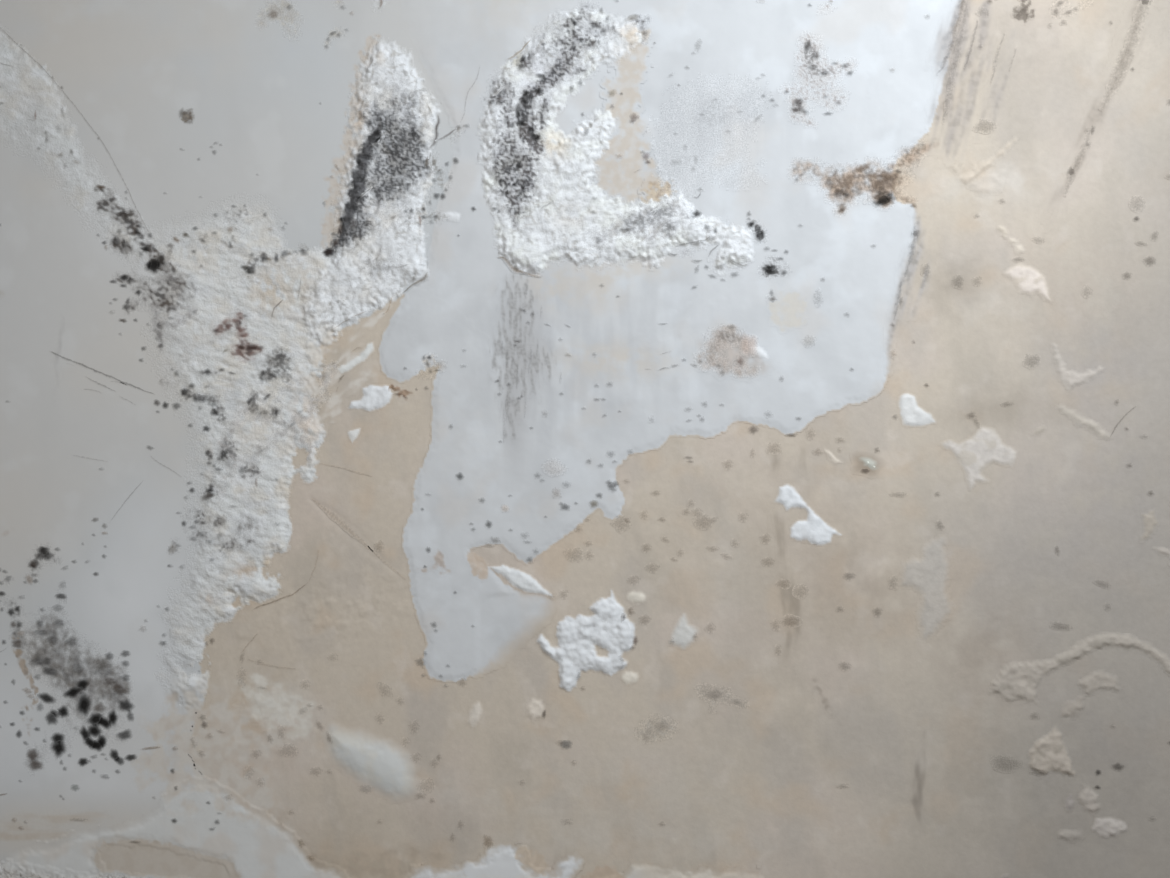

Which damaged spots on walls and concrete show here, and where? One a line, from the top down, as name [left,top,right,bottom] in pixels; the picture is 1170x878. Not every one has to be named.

spalling [0,21,139,249]
spalling [140,192,328,693]
leakage [91,78,471,570]
leakage [534,448,635,563]
leakage [479,0,860,290]
leakage [787,139,931,327]
peeling [896,391,937,428]
peeling [938,425,1020,491]
peeling [1001,262,1054,304]
leakage [0,517,226,783]
peeling [535,588,641,692]
leakage [0,783,243,878]